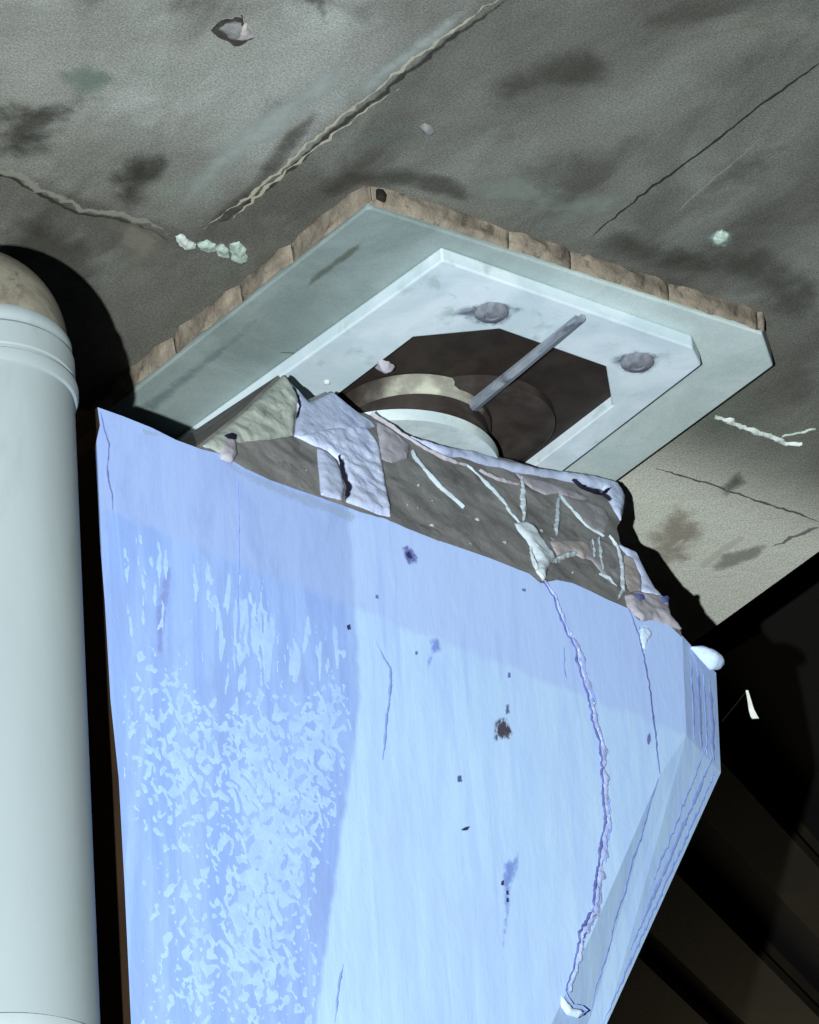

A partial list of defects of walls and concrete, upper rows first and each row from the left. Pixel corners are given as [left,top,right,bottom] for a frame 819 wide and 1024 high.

spalling [211,15,254,46]
crack [204,0,499,229]
crack [593,63,819,236]
crack [0,169,165,239]
leakage [175,233,248,266]
spalling [179,375,683,637]
crack [656,468,818,546]
peeling [116,535,168,637]
leakage [404,546,416,563]
rust [495,705,511,740]
crack [543,579,660,1016]